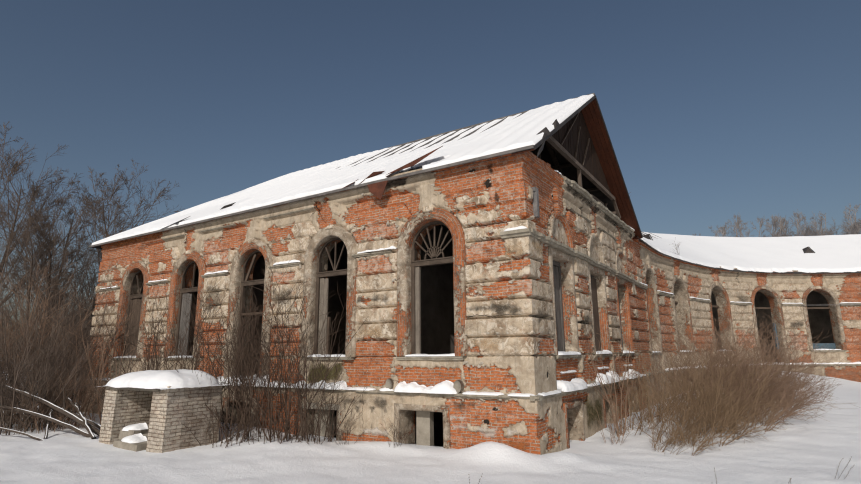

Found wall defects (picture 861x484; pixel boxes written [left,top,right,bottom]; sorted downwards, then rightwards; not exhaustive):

flaking render [94,232,174,311]
flaking render [261,223,296,257]
flaking render [312,189,420,244]
flaking render [431,151,597,300]
flaking render [534,226,650,420]
flaking render [654,261,719,354]
flaking render [826,274,861,382]
flaking render [340,336,562,455]